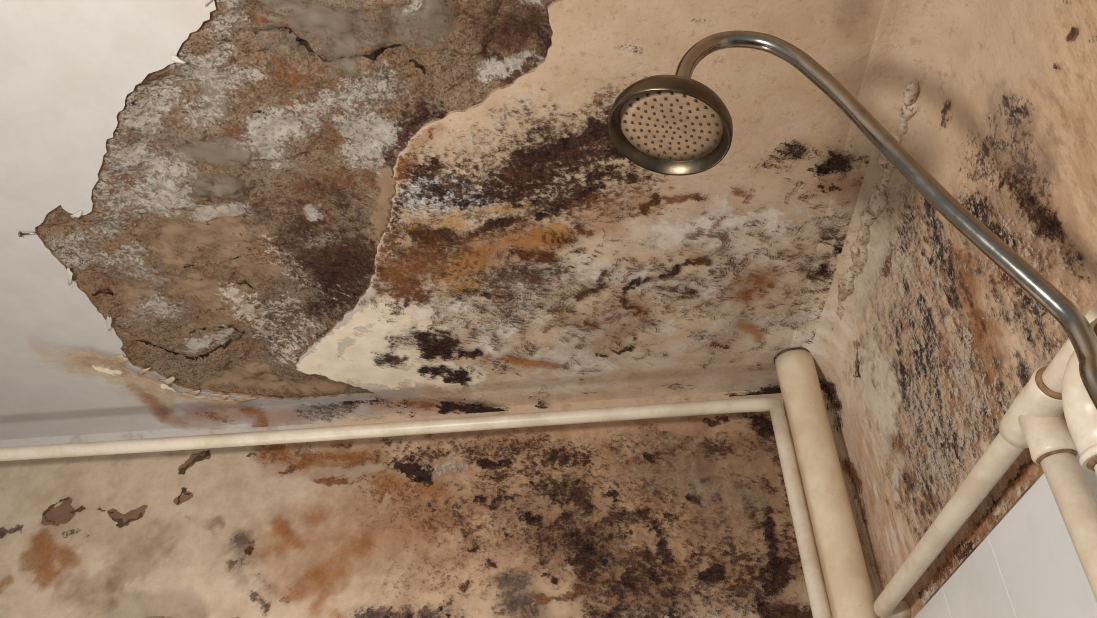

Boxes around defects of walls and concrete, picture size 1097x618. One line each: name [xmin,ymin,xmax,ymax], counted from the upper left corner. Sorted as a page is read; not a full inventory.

flaking render [36,0,556,406]
corrosion [401,205,574,293]
water stain [237,54,1069,544]
water stain [958,94,1089,304]
water stain [0,525,23,538]
peeling [41,497,148,528]
peeling [173,450,211,505]
corrosion [246,443,377,477]
corrosion [358,478,509,598]
water stain [374,412,813,618]
water stain [918,460,1036,607]
water stain [354,579,470,618]